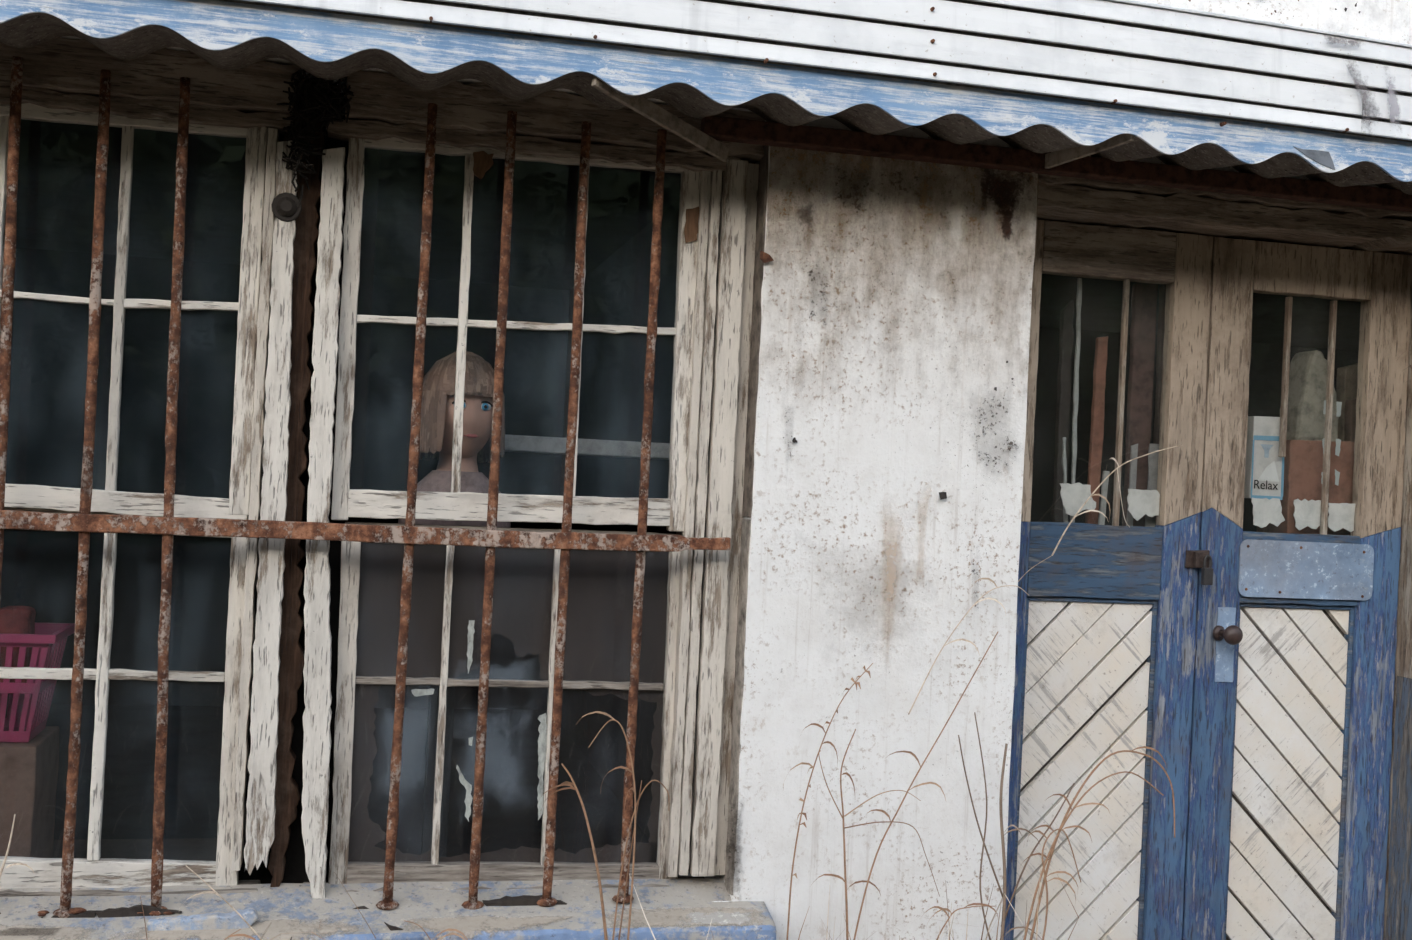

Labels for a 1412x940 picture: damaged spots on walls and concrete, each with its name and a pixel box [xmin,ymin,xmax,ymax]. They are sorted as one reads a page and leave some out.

leakage [974,361,1018,472]
peeling [0,925,93,940]
peeling [109,908,363,940]